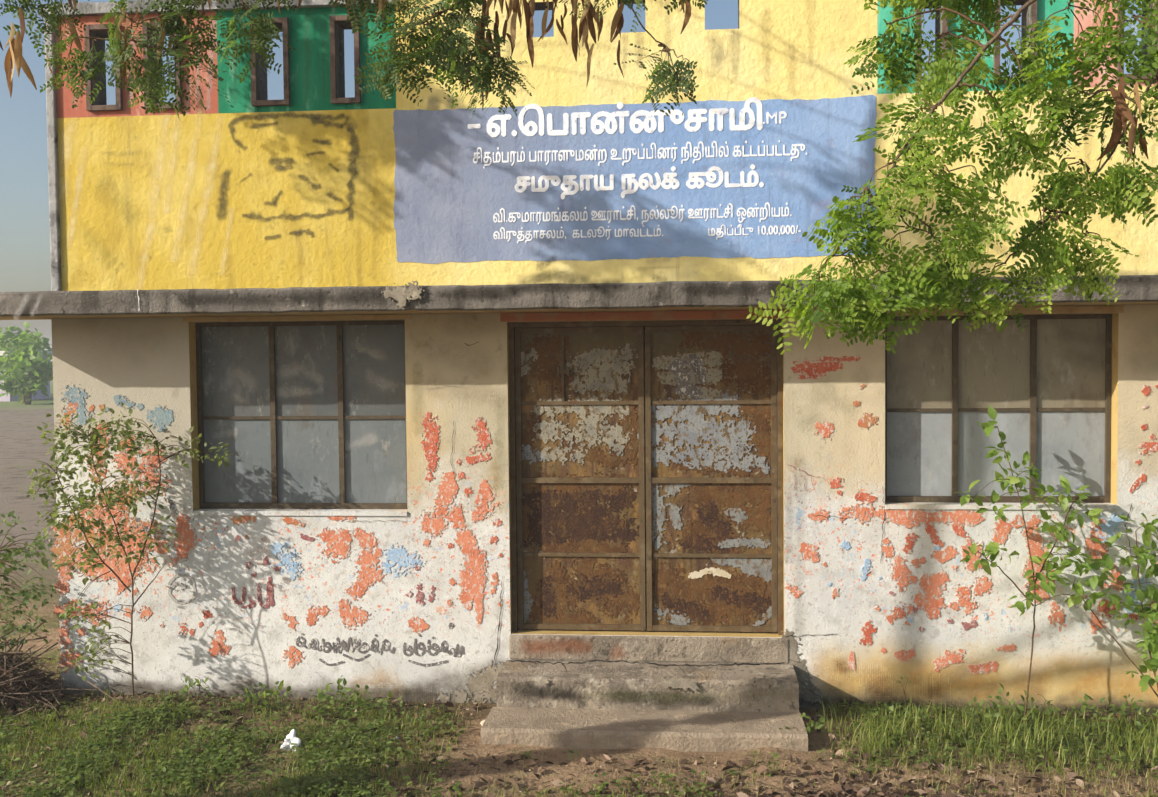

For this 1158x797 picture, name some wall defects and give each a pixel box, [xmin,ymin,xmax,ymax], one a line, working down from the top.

peeling [790,355,861,380]
peeling [1140,384,1158,409]
peeling [49,384,231,674]
peeling [224,412,503,668]
rust [522,331,778,633]
peeling [808,477,1066,674]
peeling [1084,512,1158,634]
peeling [1129,424,1158,493]
spalling [436,660,504,703]